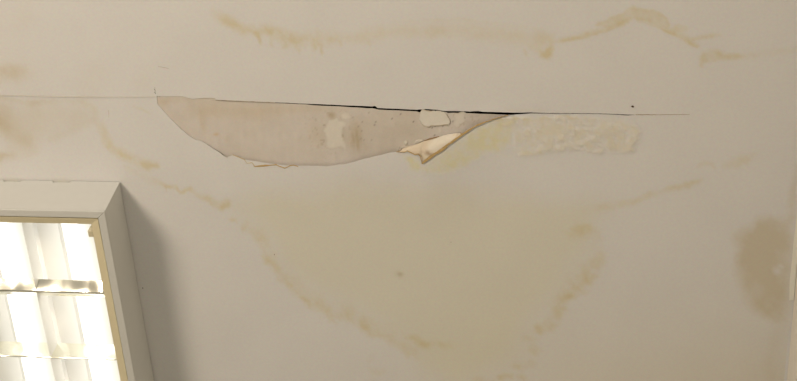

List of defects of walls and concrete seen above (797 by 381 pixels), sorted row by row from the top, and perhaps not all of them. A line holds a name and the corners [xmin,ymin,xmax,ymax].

leakage [207,4,797,71]
peeling [157,96,508,169]
crack [218,100,593,115]
leakage [400,115,515,176]
crack [614,110,690,118]
leakage [0,59,466,365]
leakage [468,176,707,381]
leakage [726,160,797,381]